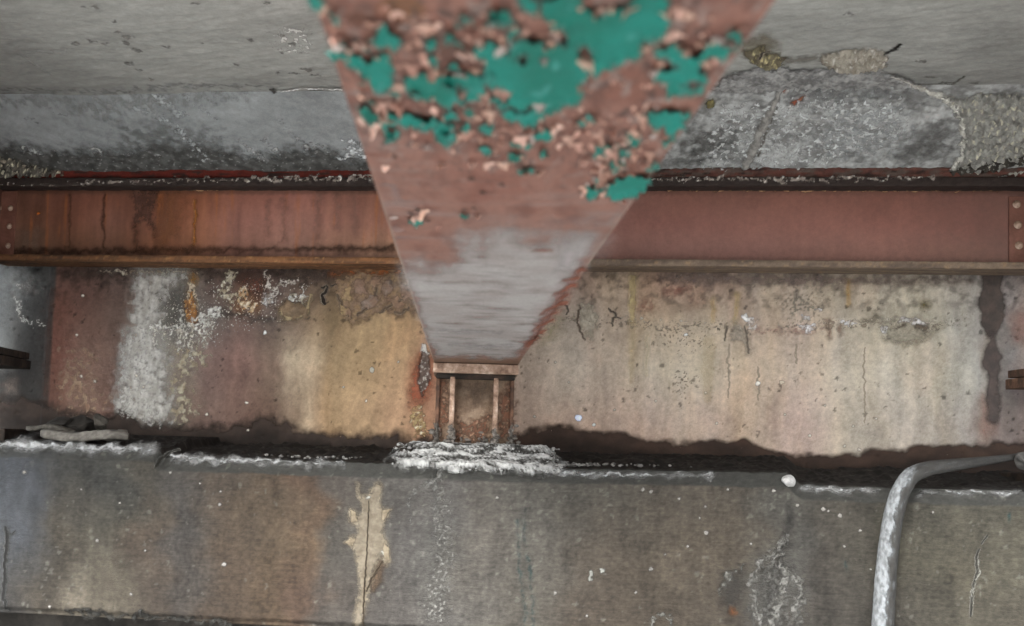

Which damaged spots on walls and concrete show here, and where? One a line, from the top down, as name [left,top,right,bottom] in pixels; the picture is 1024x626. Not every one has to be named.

leakage [12,83,239,162]
leakage [296,137,366,161]
peeling [307,0,1024,204]
peeling [390,209,443,231]
corrosion [184,270,199,324]
peeling [335,232,594,359]
crack [608,307,621,327]
corrosion [408,344,518,443]
leakage [0,267,1024,626]
peeling [345,482,391,626]
crack [362,501,383,626]
crack [969,535,988,617]